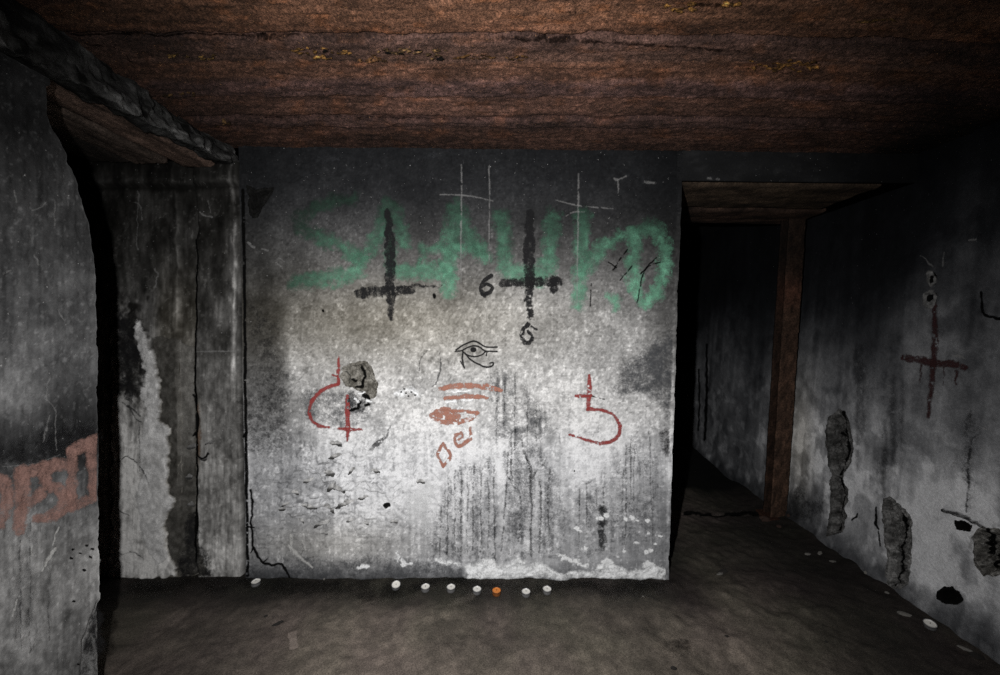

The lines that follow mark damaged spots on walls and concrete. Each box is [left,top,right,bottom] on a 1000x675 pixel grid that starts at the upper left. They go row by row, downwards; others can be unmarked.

flaking render [134,321,214,576]
crack [192,240,209,562]
crack [241,189,290,578]
spalling [340,361,378,411]
water stain [497,377,551,543]
spalling [825,409,854,537]
water stain [389,511,666,591]
spalling [881,496,913,594]
hole [936,586,964,605]
spalling [941,509,1000,577]